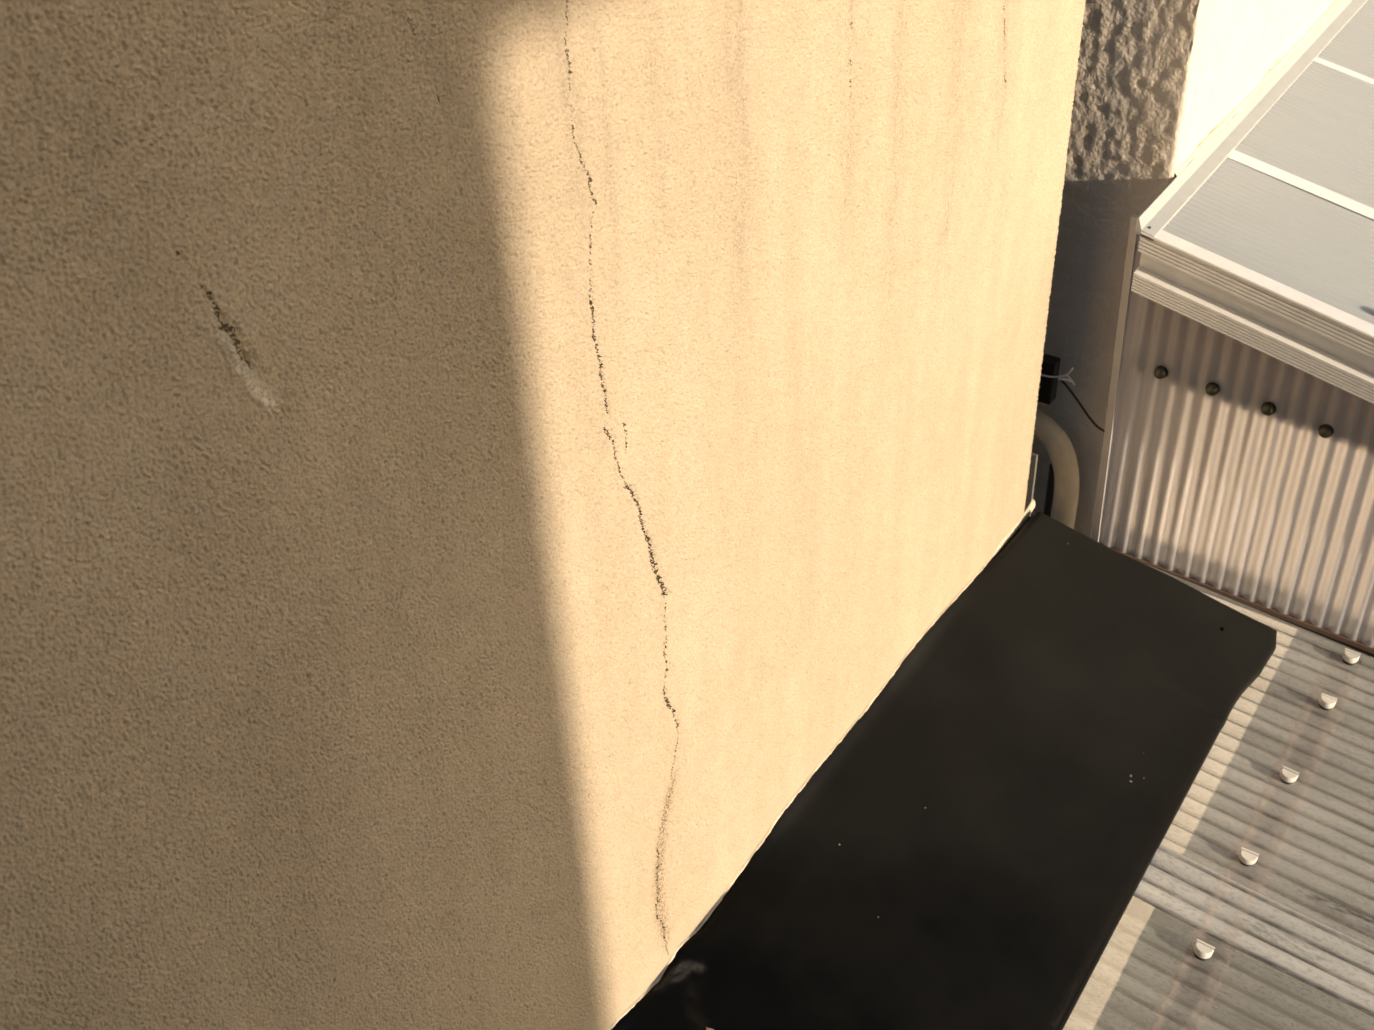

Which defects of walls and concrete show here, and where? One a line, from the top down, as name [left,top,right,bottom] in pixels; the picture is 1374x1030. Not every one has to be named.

crack [564,0,679,953]